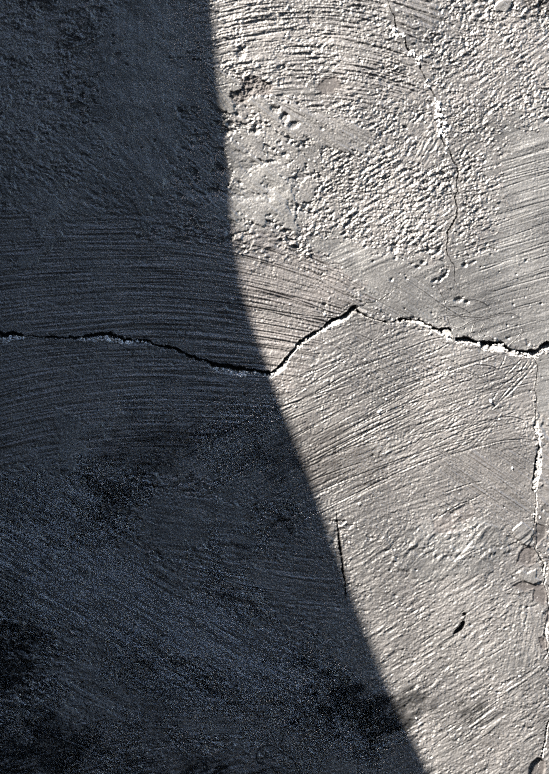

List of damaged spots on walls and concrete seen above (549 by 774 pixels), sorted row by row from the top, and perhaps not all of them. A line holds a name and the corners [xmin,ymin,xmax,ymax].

crack [387,0,460,284]
crack [0,285,549,657]
crack [255,729,301,774]
crack [536,712,549,769]